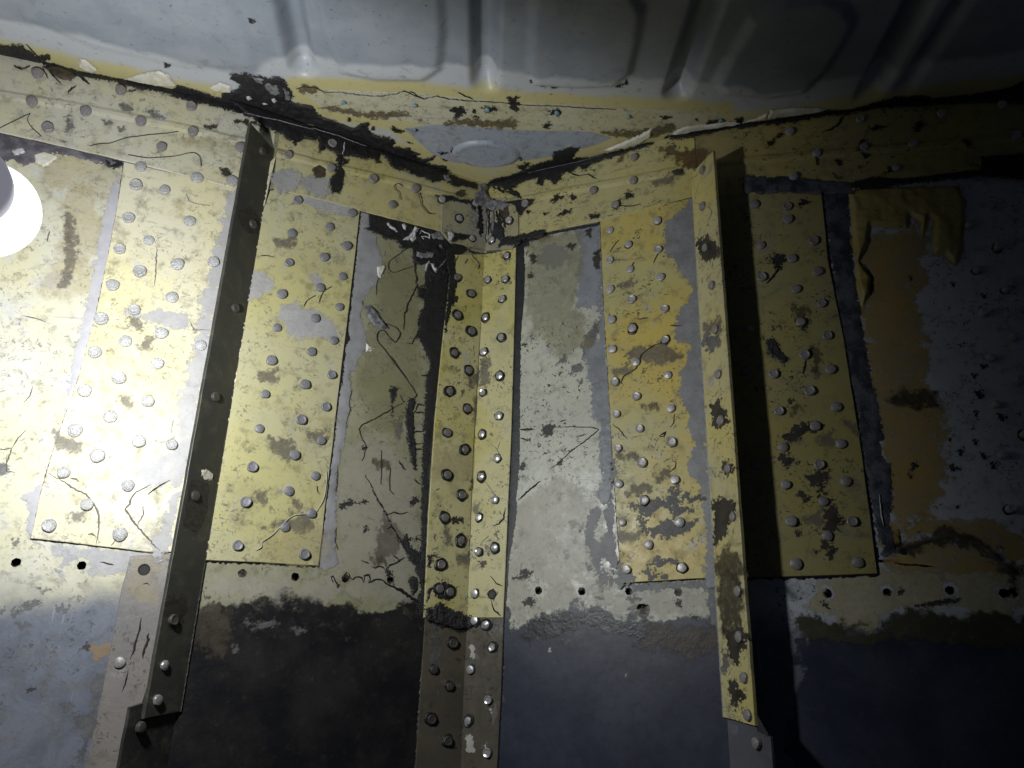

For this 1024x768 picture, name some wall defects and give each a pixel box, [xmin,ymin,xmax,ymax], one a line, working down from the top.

peeling [77,58,97,74]
peeling [119,62,177,119]
peeling [450,96,521,119]
peeling [600,107,826,152]
peeling [270,145,357,216]
peeling [526,192,576,218]
peeling [387,222,444,273]
peeling [848,166,967,311]
peeling [248,270,275,302]
damp [915,597,962,608]
damp [246,616,277,630]
damp [521,608,652,646]